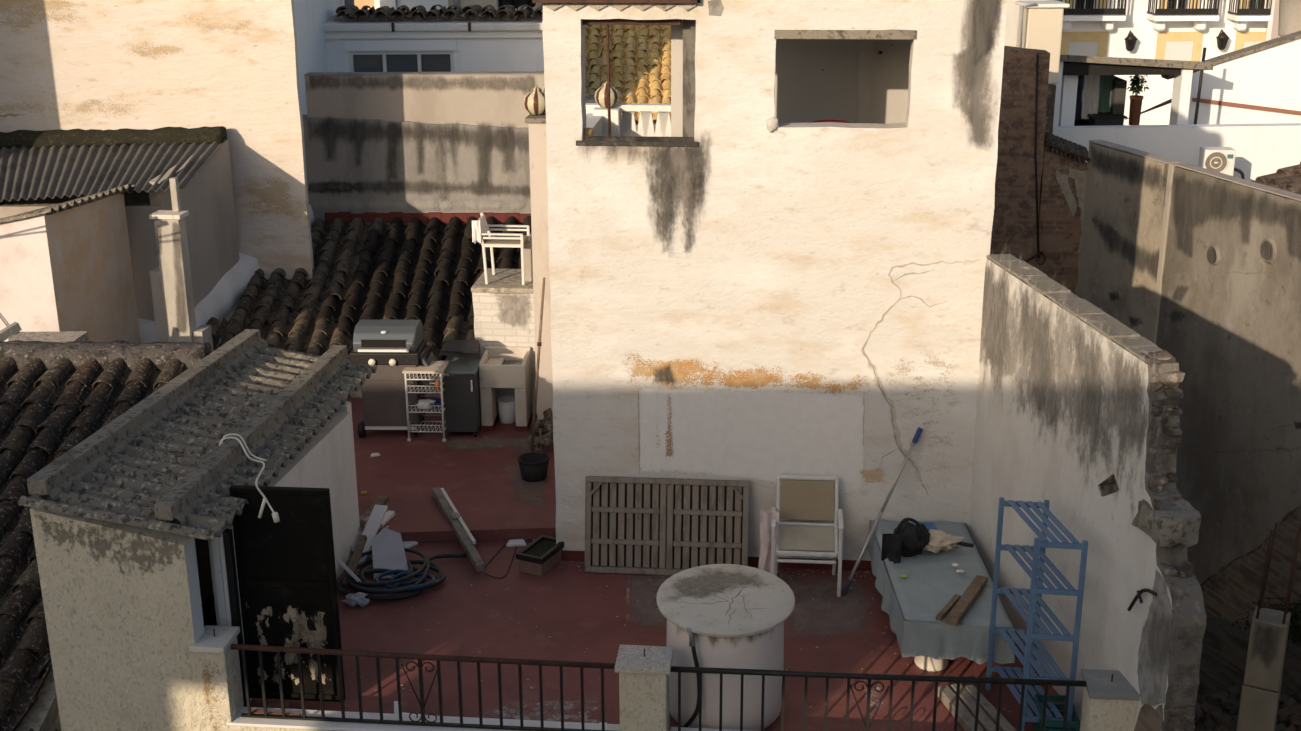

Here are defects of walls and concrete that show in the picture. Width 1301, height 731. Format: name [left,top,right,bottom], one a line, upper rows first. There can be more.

leakage [956,0,1000,114]
leakage [233,118,531,223]
leakage [593,140,708,251]
leakage [1094,220,1159,280]
leakage [1091,148,1301,259]
leakage [982,267,1057,432]
leakage [1075,336,1144,455]
flaking render [1200,506,1301,626]
flaking render [1134,571,1178,731]